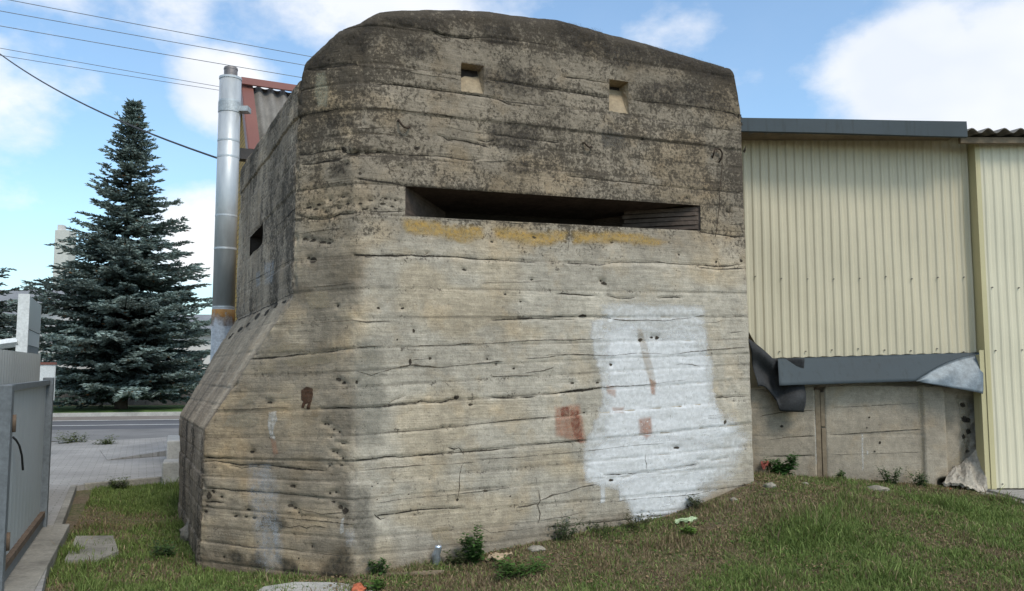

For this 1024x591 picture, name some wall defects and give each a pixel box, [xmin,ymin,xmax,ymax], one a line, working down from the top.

corrosion [211,309,235,326]
corrosion [301,387,313,409]
crack [206,252,748,556]
corrosion [556,406,584,442]